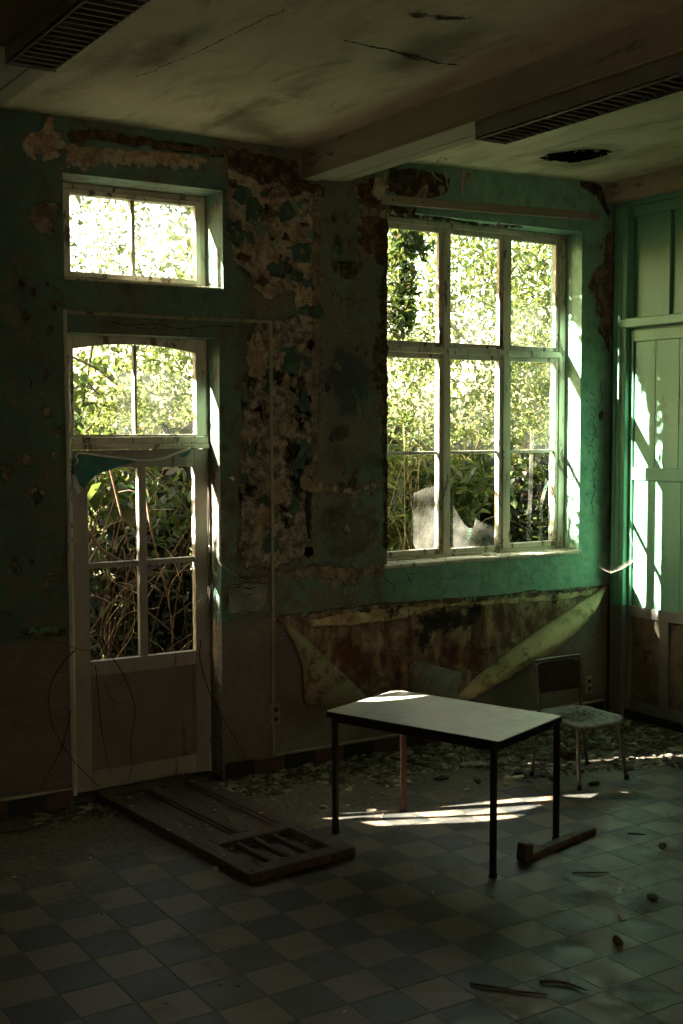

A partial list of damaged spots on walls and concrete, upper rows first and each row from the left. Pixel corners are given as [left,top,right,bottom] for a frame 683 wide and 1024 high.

crack [344,40,456,65]
flaking render [580,181,610,217]
flaking render [22,115,325,570]
peeling [340,168,523,549]
flaking render [588,231,614,353]
peeling [278,585,603,702]
leakage [414,600,481,653]